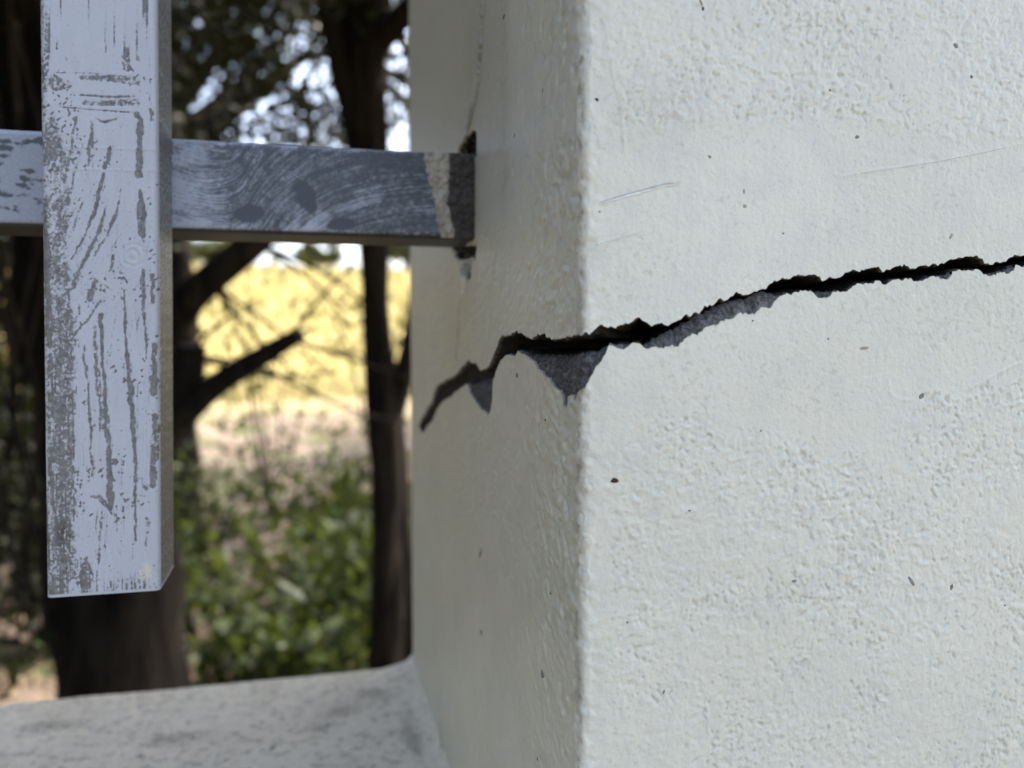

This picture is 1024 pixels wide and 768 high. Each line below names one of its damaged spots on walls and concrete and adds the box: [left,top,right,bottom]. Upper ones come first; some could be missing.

crack [419,255,1024,434]